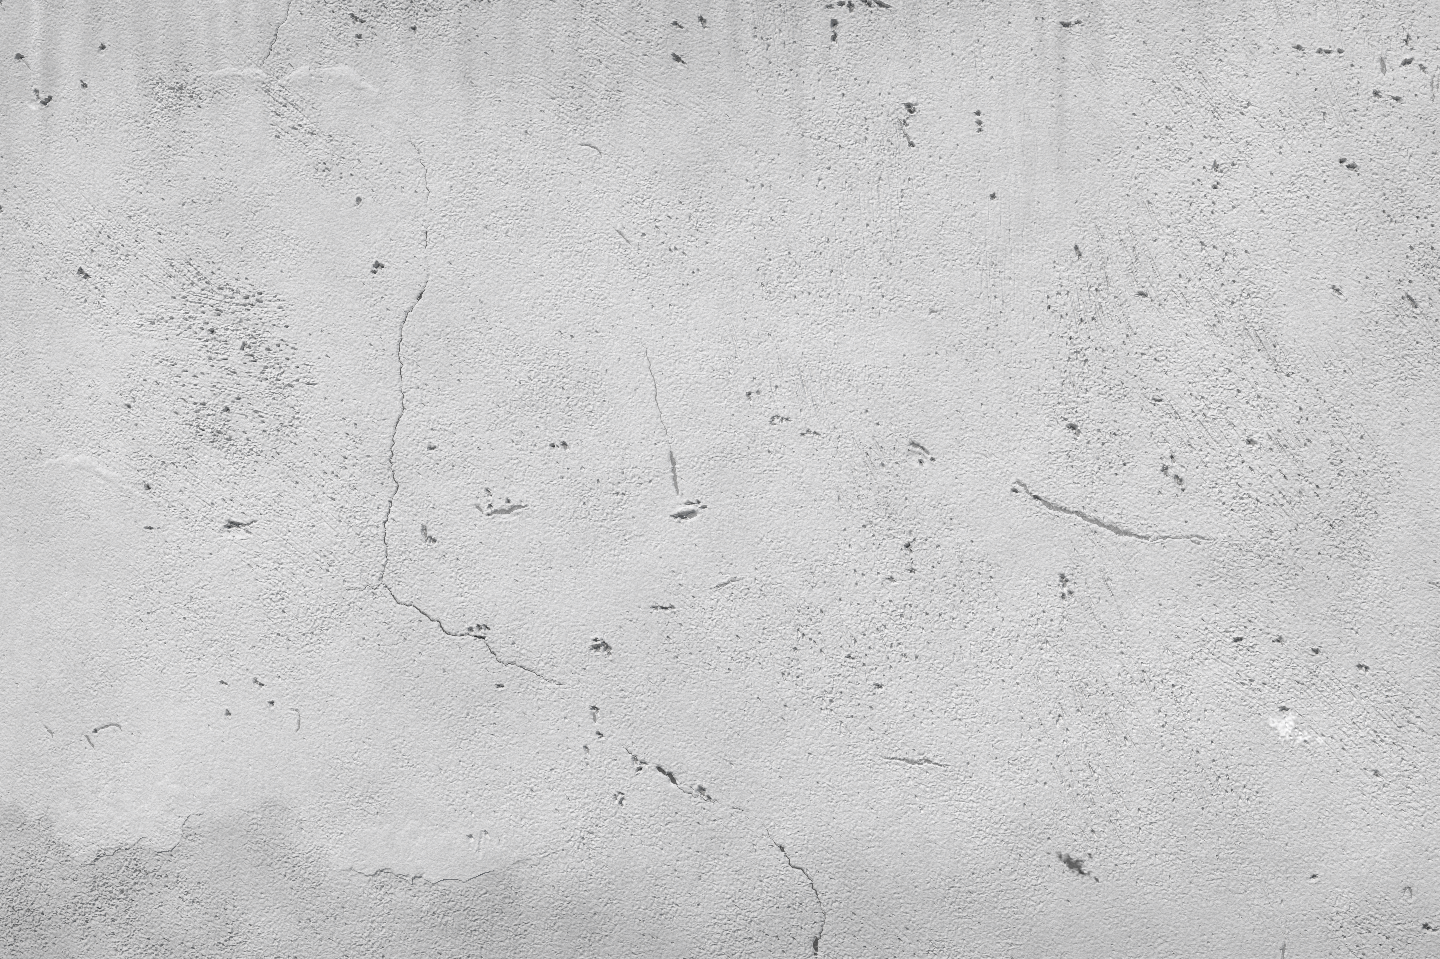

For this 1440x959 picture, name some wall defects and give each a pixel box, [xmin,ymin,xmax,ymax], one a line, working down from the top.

crack [344,143,562,685]
crack [625,748,826,959]